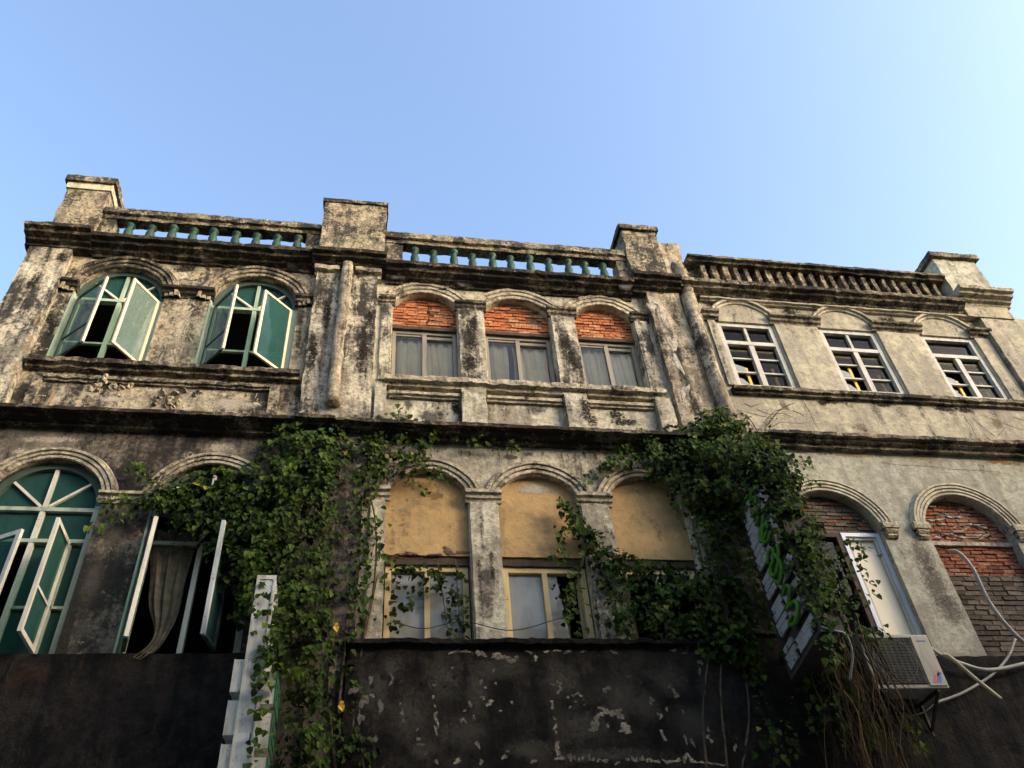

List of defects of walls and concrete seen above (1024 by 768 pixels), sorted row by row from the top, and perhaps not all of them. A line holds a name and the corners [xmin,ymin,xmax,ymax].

damp [40,312,56,352]
damp [304,299,332,379]
mould [357,307,376,385]
mould [462,317,479,371]
mould [561,336,577,371]
peeling [926,505,997,541]
peeling [448,649,588,724]
peeling [550,680,726,766]